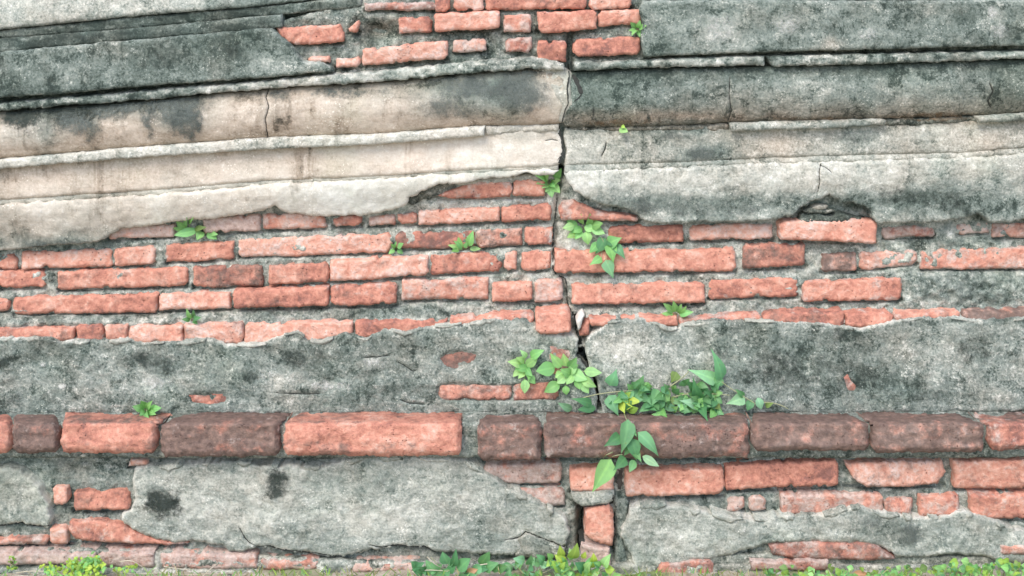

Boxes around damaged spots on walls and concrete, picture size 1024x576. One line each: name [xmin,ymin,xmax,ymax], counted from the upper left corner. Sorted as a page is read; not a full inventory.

flaking render [276,0,650,75]
damp [3,98,202,142]
crack [545,64,594,168]
flaking render [0,166,1024,400]
crack [552,197,601,402]
flaking render [0,456,1024,576]